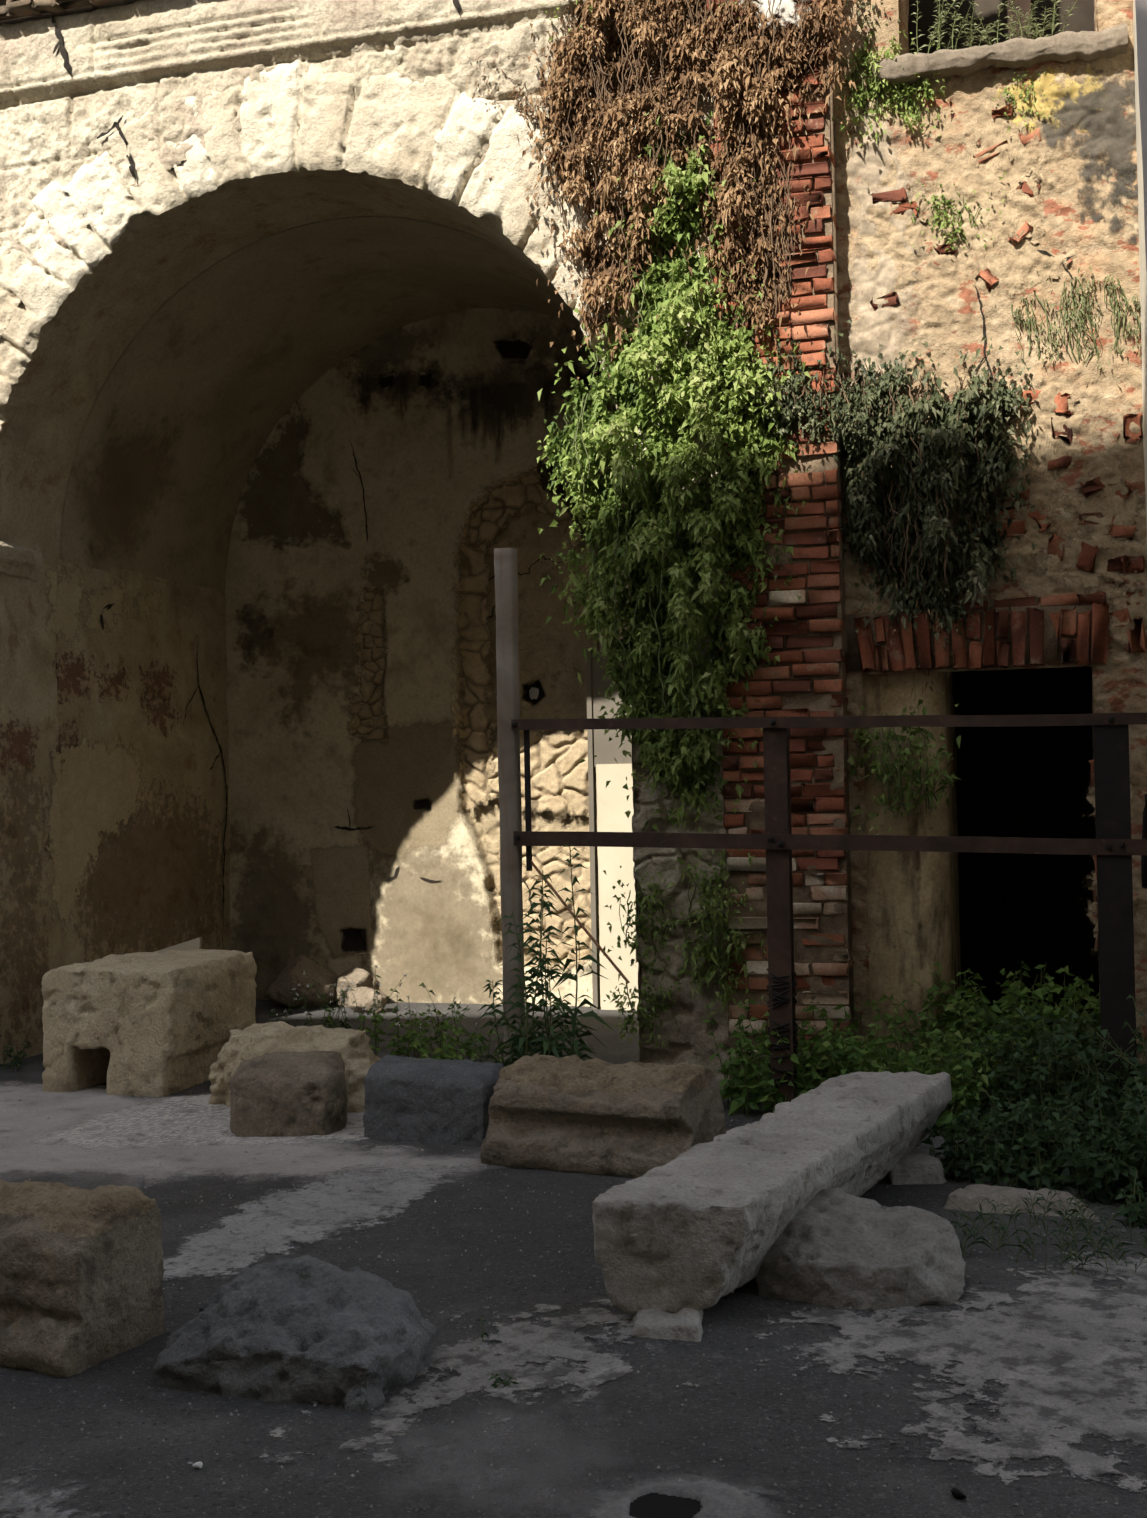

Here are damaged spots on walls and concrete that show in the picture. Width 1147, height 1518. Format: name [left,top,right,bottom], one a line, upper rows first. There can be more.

spalling [845,94,1078,401]
leakage [338,316,617,461]
spalling [536,458,594,542]
spalling [971,371,1147,657]
leakage [237,585,366,735]
spalling [523,680,545,705]